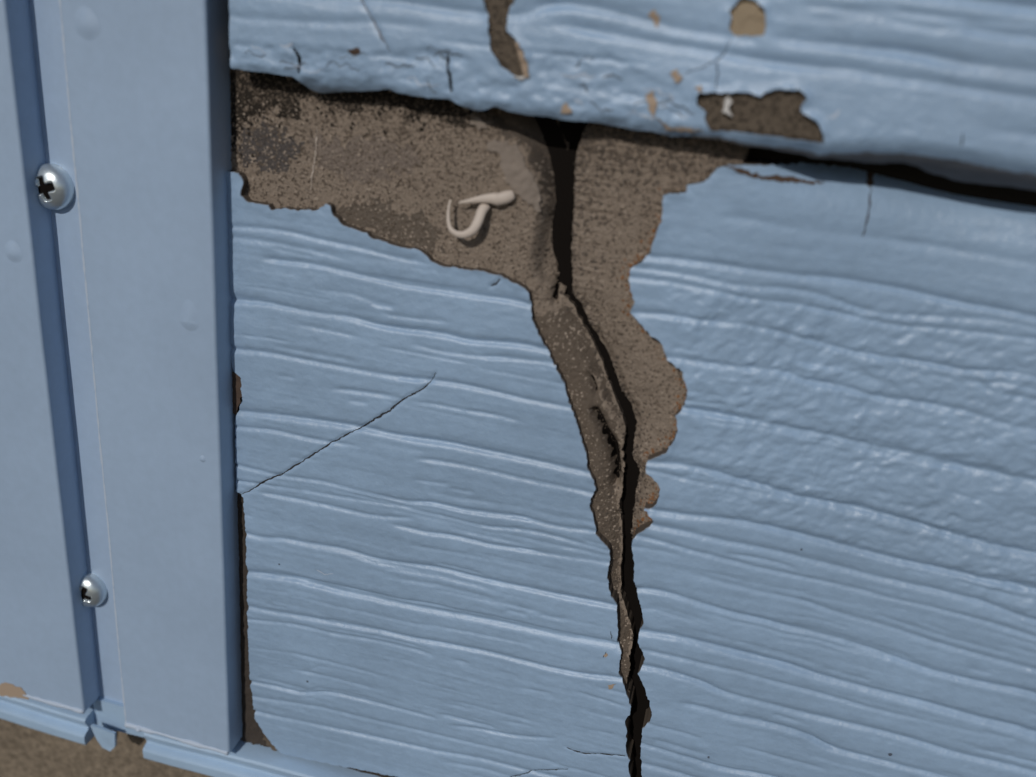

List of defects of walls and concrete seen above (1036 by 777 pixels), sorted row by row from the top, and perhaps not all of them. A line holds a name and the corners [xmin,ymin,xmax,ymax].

peeling [384,45,463,87]
peeling [485,0,530,80]
peeling [729,0,766,36]
spalling [231,52,829,681]
crack [243,373,436,494]
crack [511,116,650,777]
spalling [237,493,277,751]